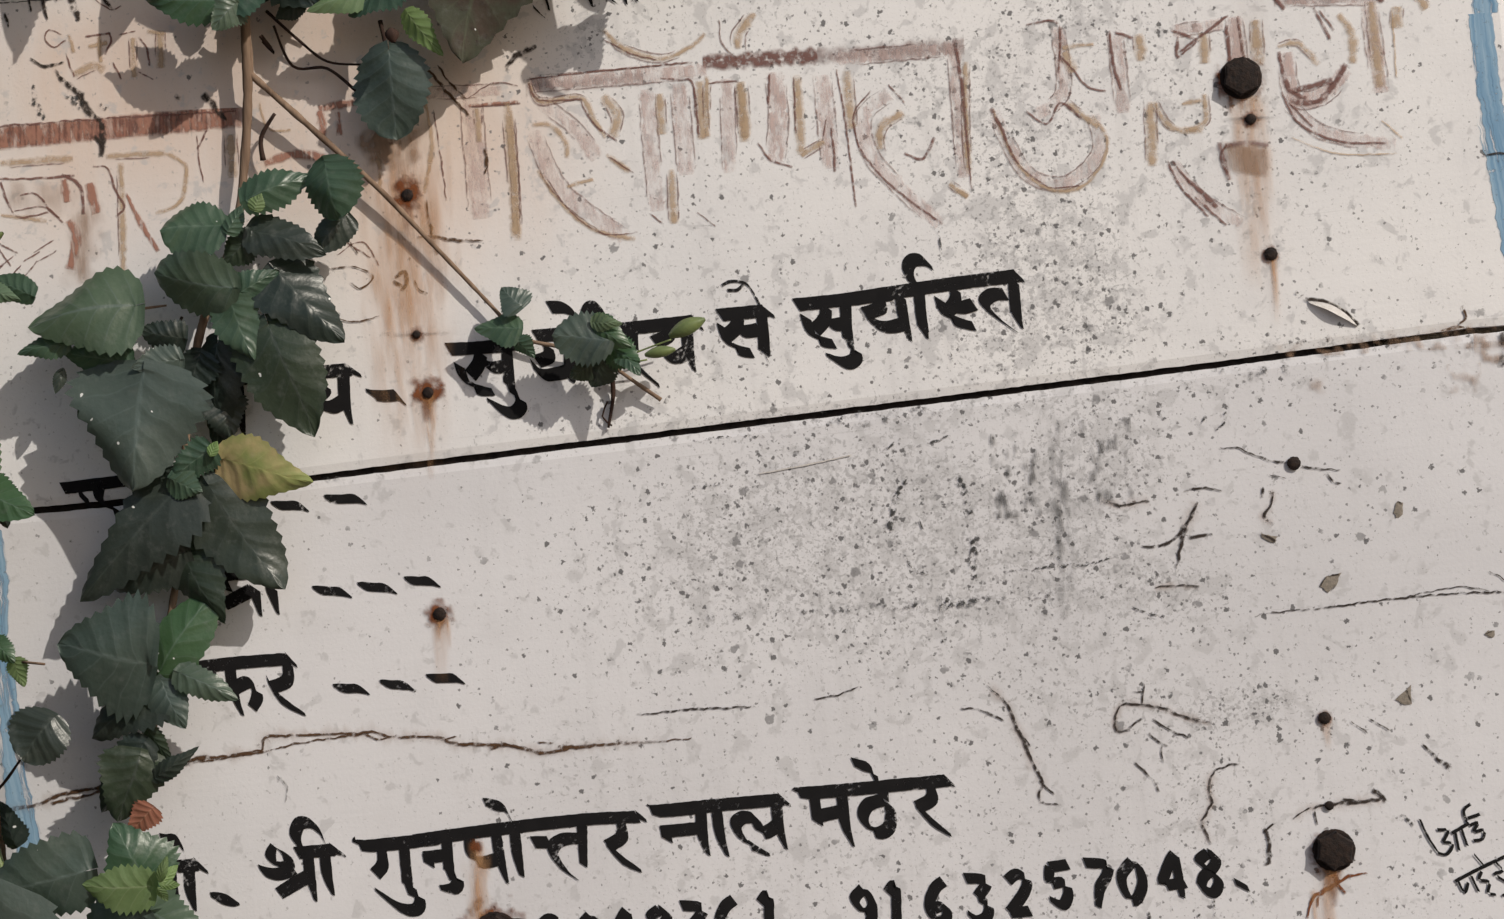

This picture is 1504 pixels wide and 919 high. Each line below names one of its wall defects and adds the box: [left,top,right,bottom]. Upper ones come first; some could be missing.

corrosion [1216,72,1259,126]
corrosion [360,131,423,223]
corrosion [412,378,445,415]
corrosion [426,599,451,627]
crack [1266,571,1504,614]
crack [188,730,691,762]
crack [961,687,1058,805]
crack [22,785,100,809]
corrosion [471,841,513,917]